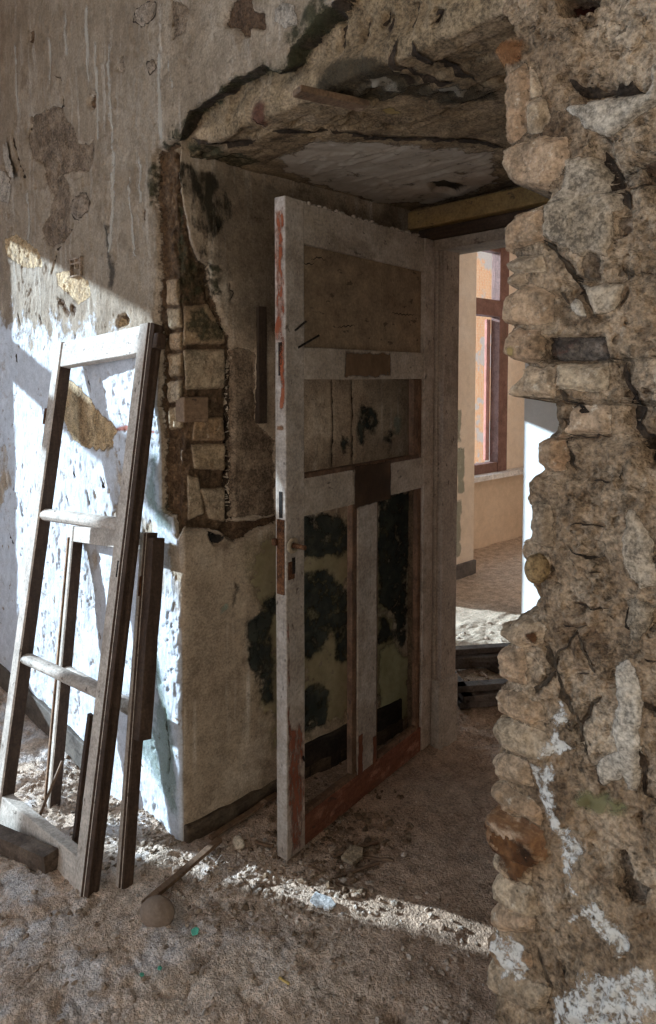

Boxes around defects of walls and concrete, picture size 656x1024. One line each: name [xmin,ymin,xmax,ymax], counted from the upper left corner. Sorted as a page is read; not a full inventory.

spalling [227,0,297,37]
spalling [5,106,94,268]
spalling [64,380,128,451]
flaking render [151,144,276,544]
water stain [178,141,259,255]
flaking render [280,62,633,472]
flaking render [528,502,554,574]
flaking render [491,614,555,830]
water stain [530,702,586,895]
flaking render [486,853,552,1013]
water stain [554,966,656,1024]